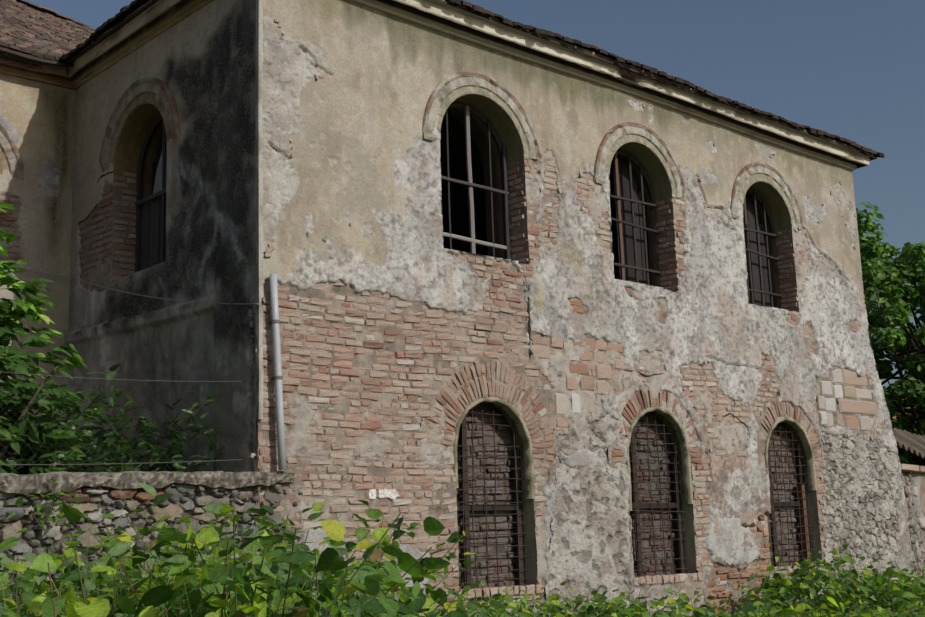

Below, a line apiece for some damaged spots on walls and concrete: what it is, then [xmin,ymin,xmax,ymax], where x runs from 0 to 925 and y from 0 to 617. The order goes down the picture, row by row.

flaking render [0,193,24,265]
water stain [99,0,257,349]
peeling [262,16,333,257]
peeling [755,143,776,158]
flaking render [786,181,857,356]
flaking render [248,149,781,617]
flaking render [815,366,876,440]
flaking render [815,457,830,565]